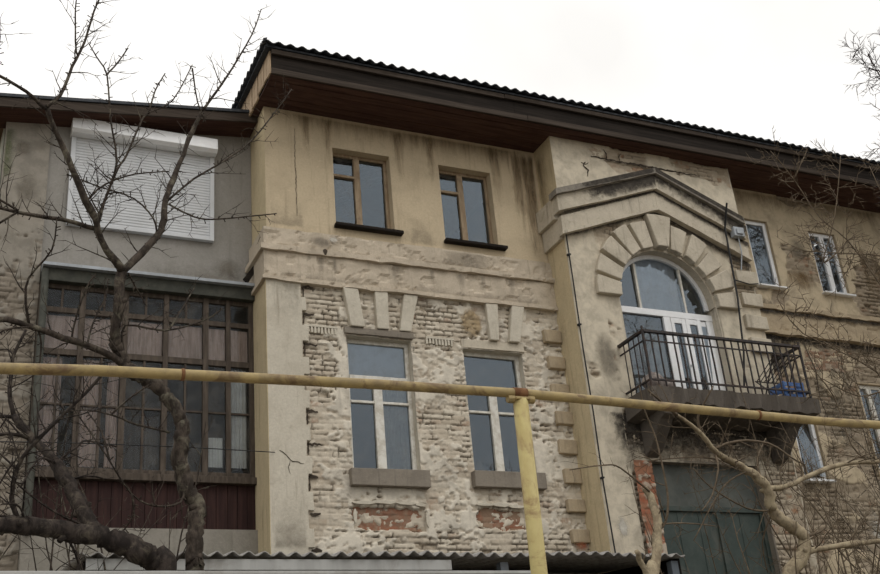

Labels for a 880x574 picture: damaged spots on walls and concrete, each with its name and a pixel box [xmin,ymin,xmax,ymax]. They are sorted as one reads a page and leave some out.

crack [581,149,697,176]
damp [760,302,880,325]
spalling [351,500,430,532]
spalling [476,502,525,531]